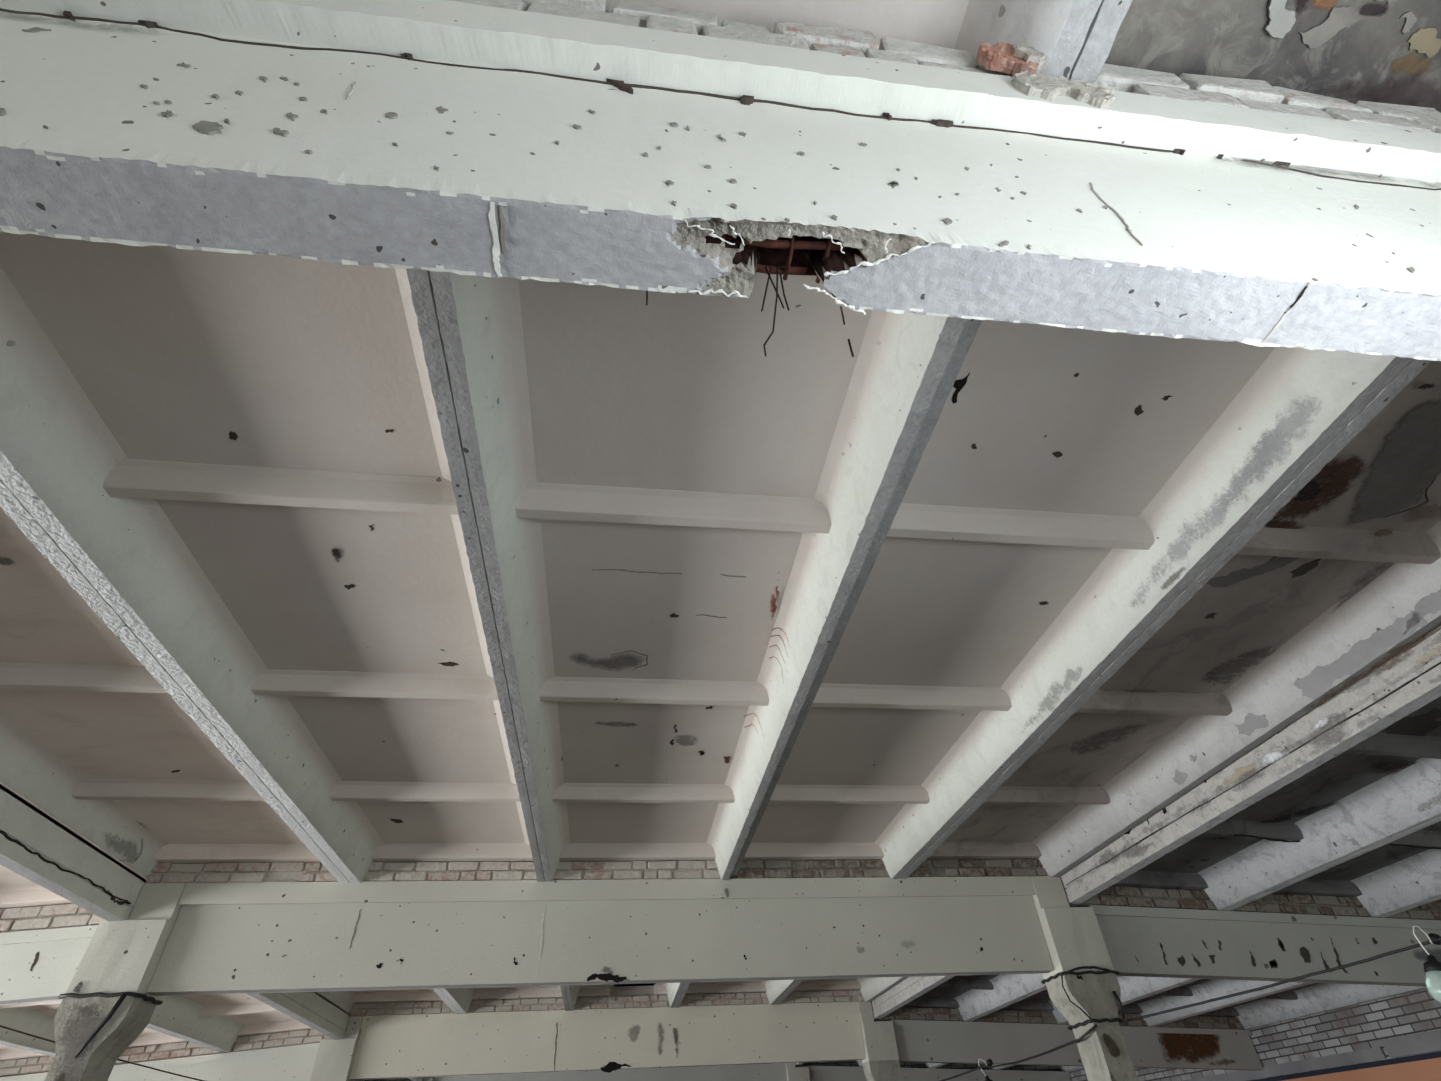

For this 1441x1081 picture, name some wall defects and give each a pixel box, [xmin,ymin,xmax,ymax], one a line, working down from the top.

peeling [1264,0,1441,74]
hole [140,84,174,118]
hole [192,119,230,135]
hole [259,76,327,137]
spalling [666,180,935,357]
damp [1265,456,1363,529]
peeling [1350,401,1441,523]
peeling [1293,585,1441,699]
peeling [1387,709,1441,736]
spalling [1160,939,1222,967]
spalling [1249,937,1349,974]
rust [1159,1033,1220,1063]